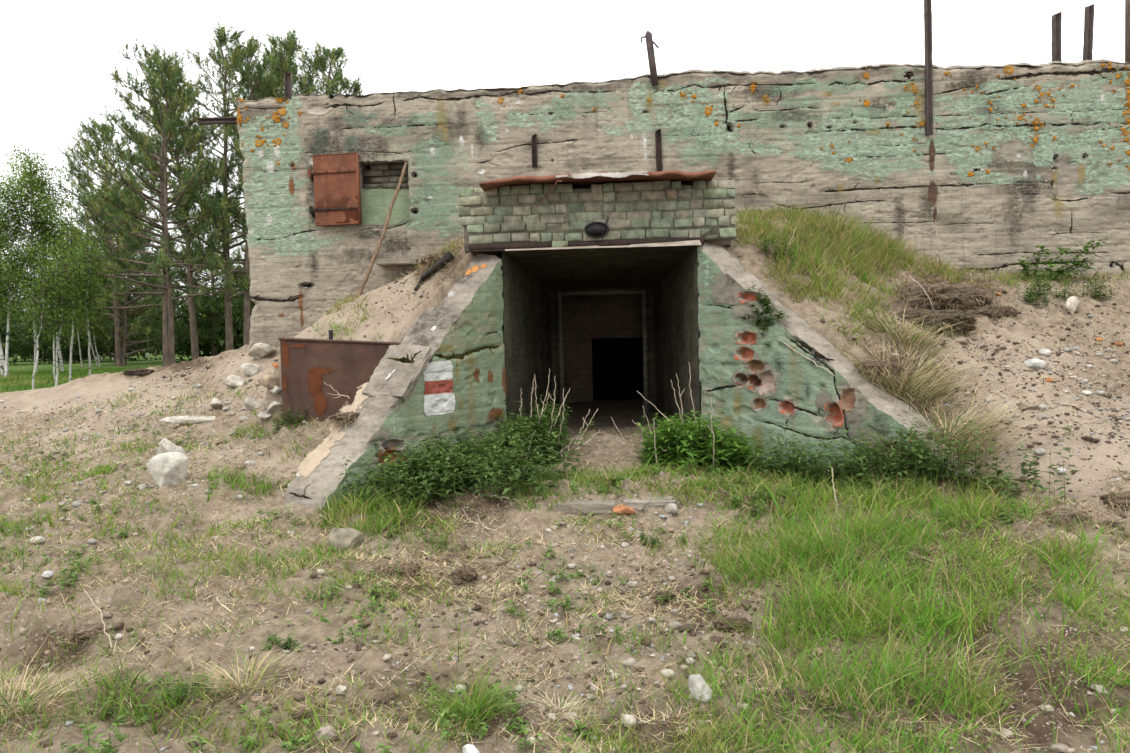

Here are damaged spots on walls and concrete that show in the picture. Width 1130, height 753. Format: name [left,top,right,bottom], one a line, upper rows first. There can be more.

peeling [239,94,465,260]
peeling [474,65,1130,196]
corrosion [928,140,938,222]
crack [701,384,739,392]
peeling [710,274,799,419]
crack [754,337,871,459]